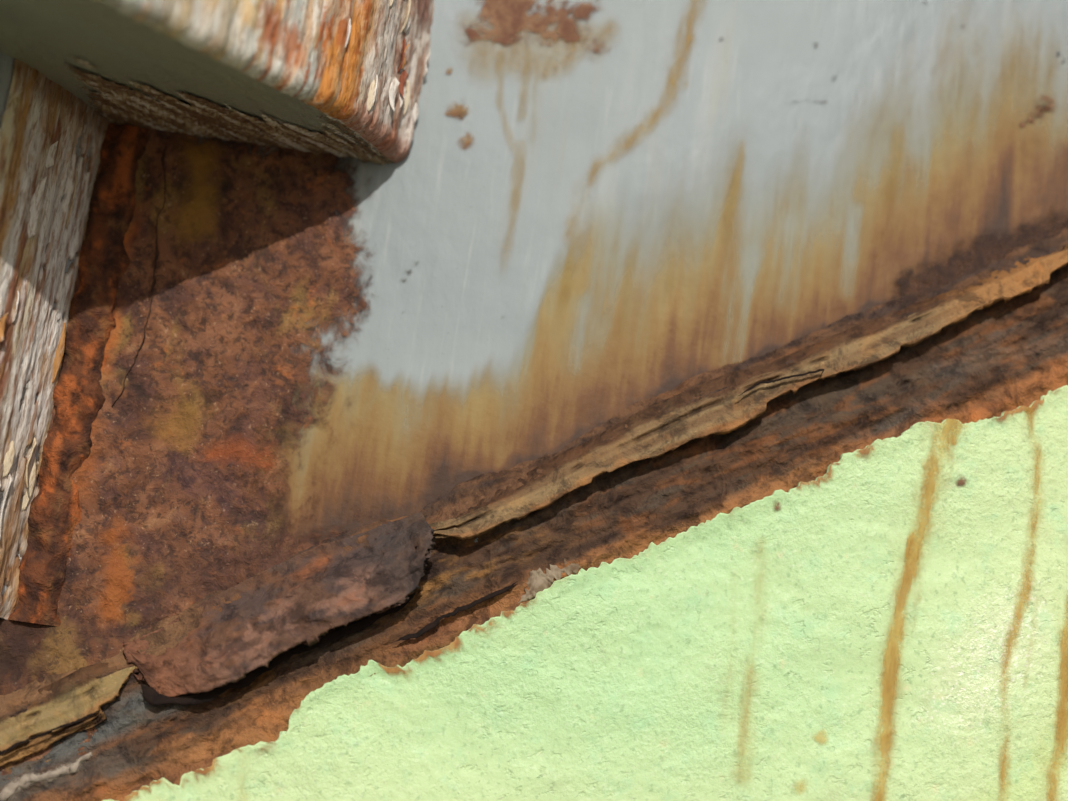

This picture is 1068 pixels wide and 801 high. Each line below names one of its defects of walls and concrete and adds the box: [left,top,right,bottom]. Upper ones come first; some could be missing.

rust [465,0,597,58]
rust [669,8,694,89]
peeling [0,0,434,620]
rust [0,83,1068,718]
rust [874,456,938,801]
rust [1048,622,1068,801]